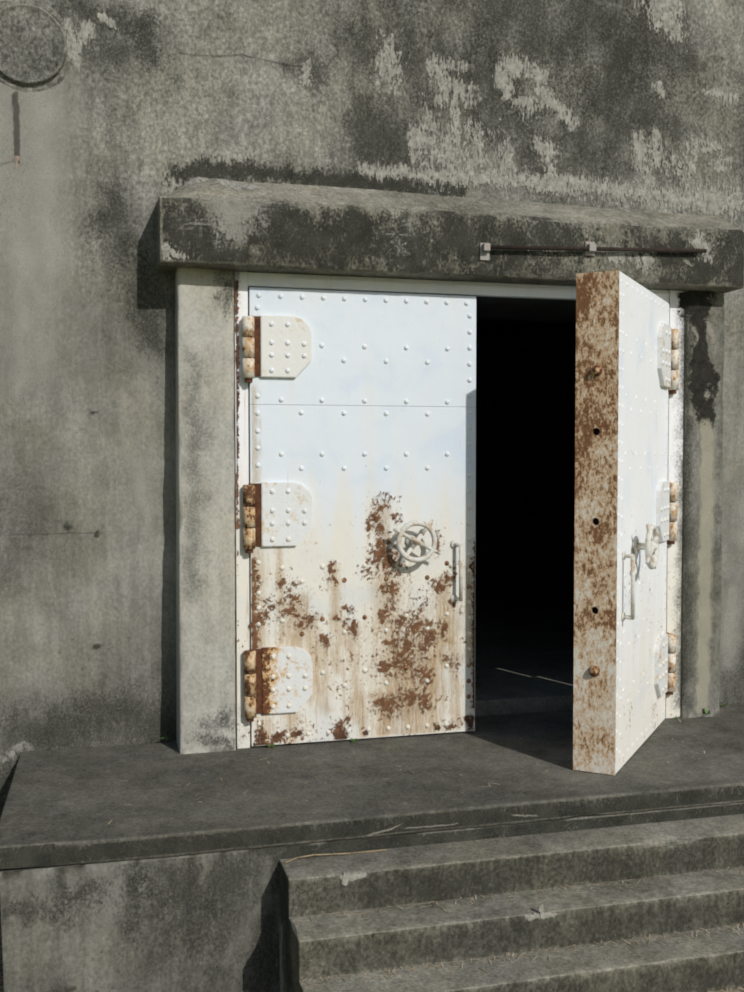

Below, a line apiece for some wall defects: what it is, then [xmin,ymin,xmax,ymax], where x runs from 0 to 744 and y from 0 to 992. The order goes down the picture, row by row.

rust [12,92,20,169]
leakage [161,0,744,314]
leakage [675,308,744,714]
leakage [1,684,176,751]
leakage [200,710,234,749]
leakage [0,766,15,818]
leakage [0,786,744,992]